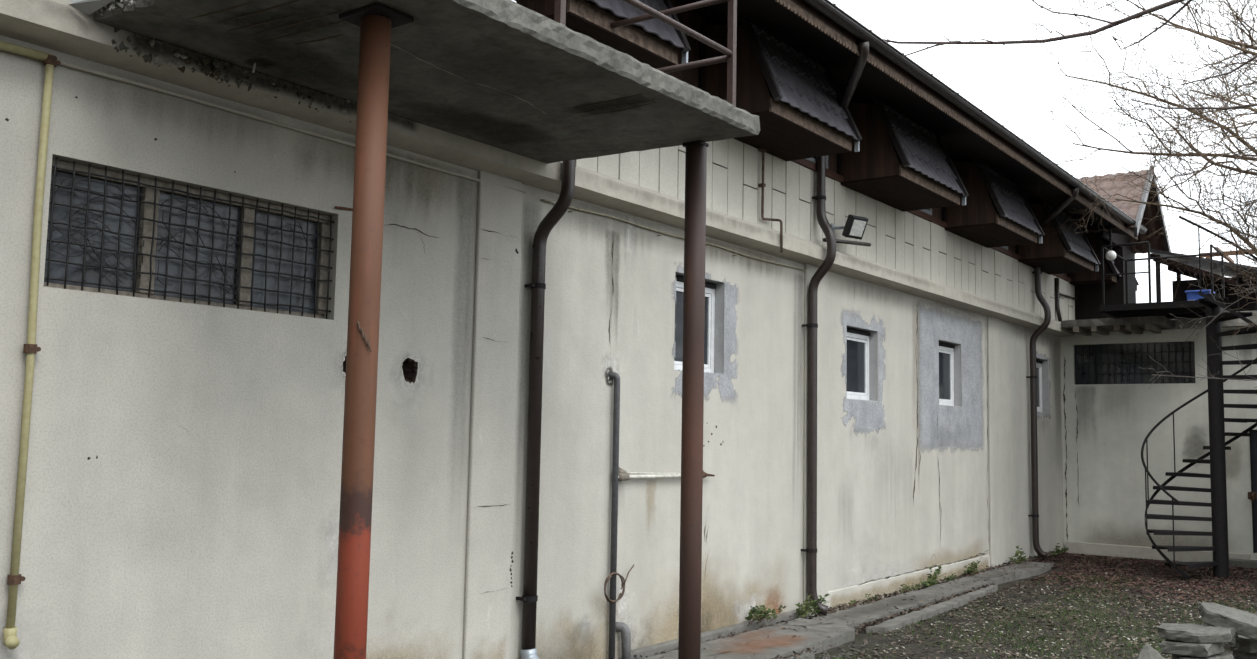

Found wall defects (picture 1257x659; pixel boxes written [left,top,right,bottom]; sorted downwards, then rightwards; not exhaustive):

spalling [69,0,149,16]
spalling [111,27,357,123]
spalling [332,341,347,389]
spalling [393,346,428,393]
water stain [658,612,679,642]
water stain [701,589,773,632]